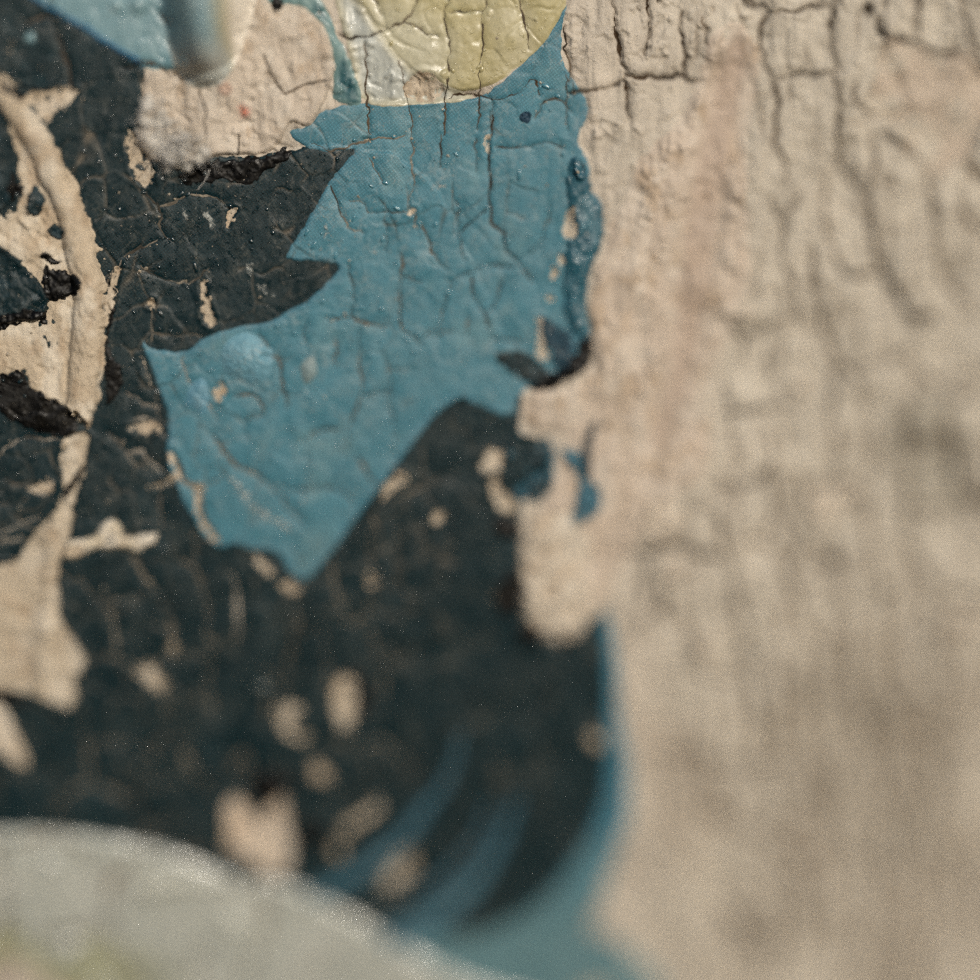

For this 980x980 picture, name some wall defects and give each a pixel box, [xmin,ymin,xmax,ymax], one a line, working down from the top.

crack [123,60,171,77]
peeling [125,0,336,188]
crack [742,0,980,304]
crack [103,191,229,310]
crack [303,0,708,434]
peeling [0,12,161,709]
crack [126,308,203,424]
peeling [495,316,579,389]
crack [0,436,58,455]
peeling [479,419,602,525]
peeling [0,704,28,766]
peeling [224,796,293,878]